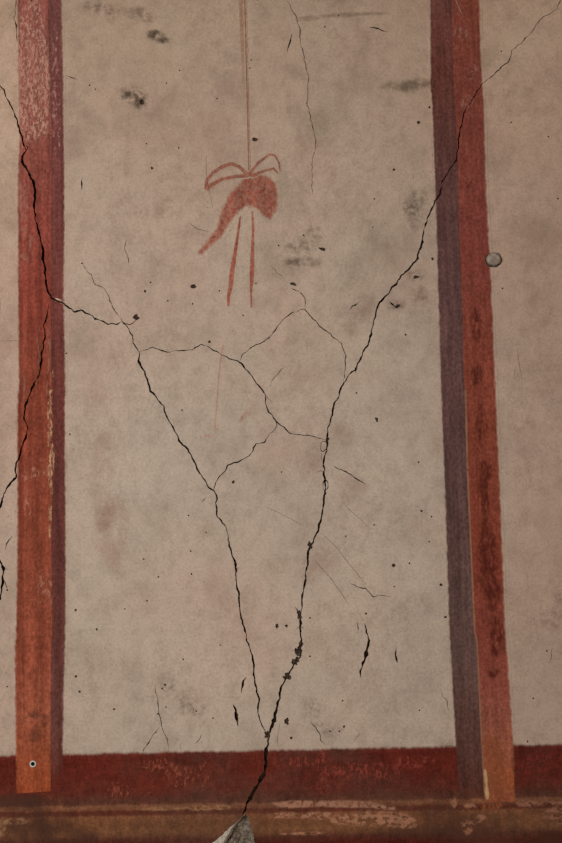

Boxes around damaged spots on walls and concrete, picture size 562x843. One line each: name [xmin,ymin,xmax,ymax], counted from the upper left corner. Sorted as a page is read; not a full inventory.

crack [290,5,316,193]
crack [441,0,561,183]
crack [0,86,442,815]
spalling [212,815,255,843]